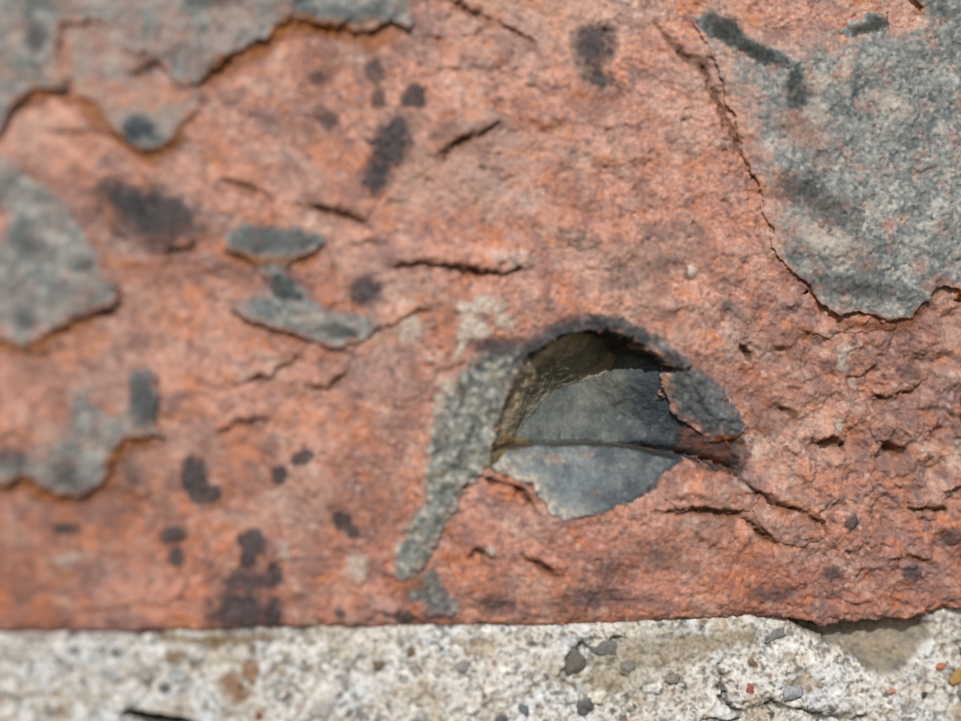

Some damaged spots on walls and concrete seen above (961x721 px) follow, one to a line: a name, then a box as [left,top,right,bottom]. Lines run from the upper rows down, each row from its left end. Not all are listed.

peeling [0,0,415,153]
peeling [0,153,122,350]
spalling [198,0,961,618]
peeling [0,366,165,498]